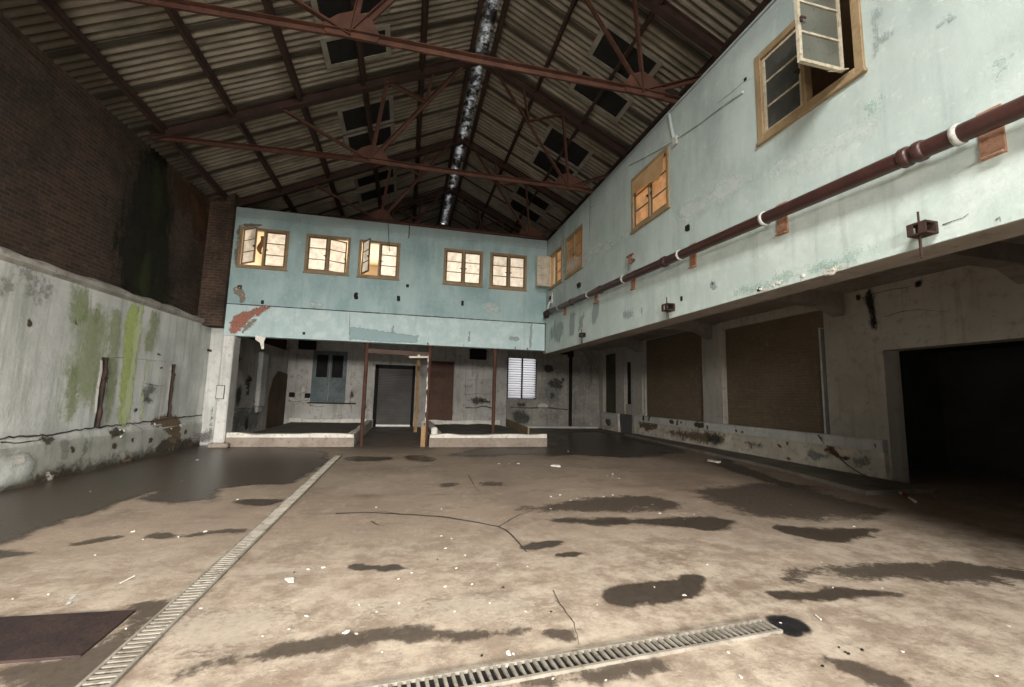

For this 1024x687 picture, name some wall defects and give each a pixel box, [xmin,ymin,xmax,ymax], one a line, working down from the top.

damp [72,146,175,425]
peeling [228,285,270,349]
damp [856,286,911,330]
damp [68,372,77,419]
mould [544,365,564,398]
flaking render [104,426,134,468]
flaking render [149,414,192,453]
damp [517,459,891,543]
crack [336,511,530,552]